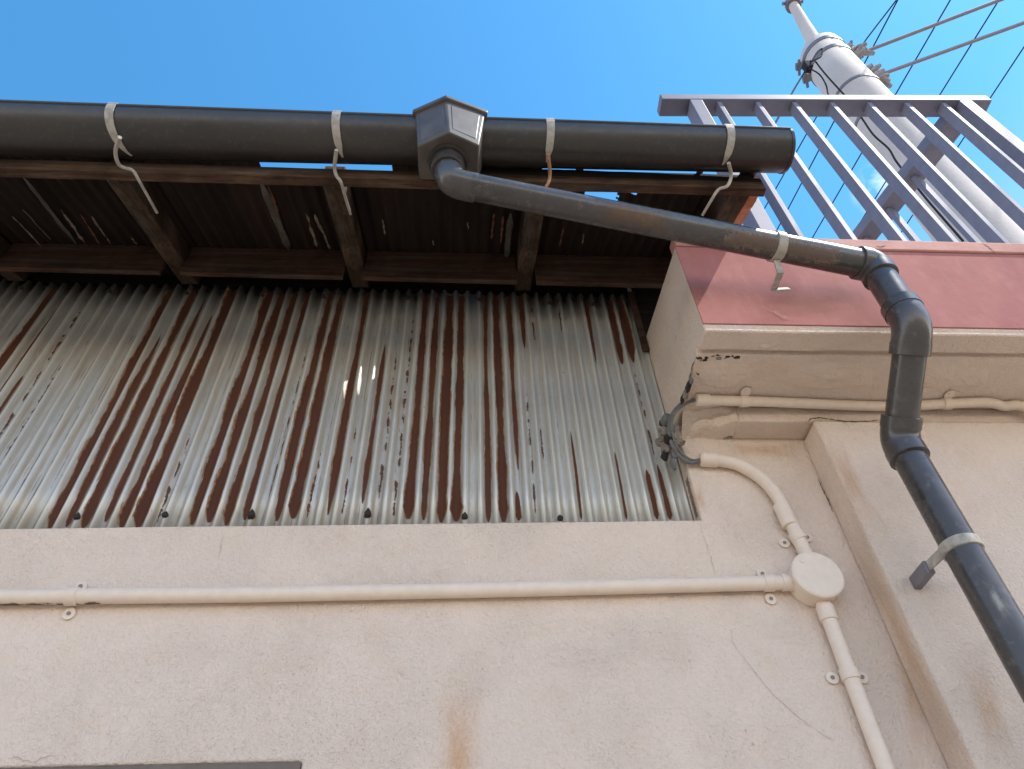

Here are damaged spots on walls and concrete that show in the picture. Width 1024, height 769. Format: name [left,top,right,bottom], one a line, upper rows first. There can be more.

rust [0,288,61,456]
rust [47,288,239,528]
rust [189,292,370,525]
rust [362,295,468,522]
rust [483,293,544,522]
rust [570,431,582,519]
rust [583,298,596,361]
rust [615,454,627,519]
rust [606,298,646,416]
rust [646,430,673,519]
crack [808,417,876,430]